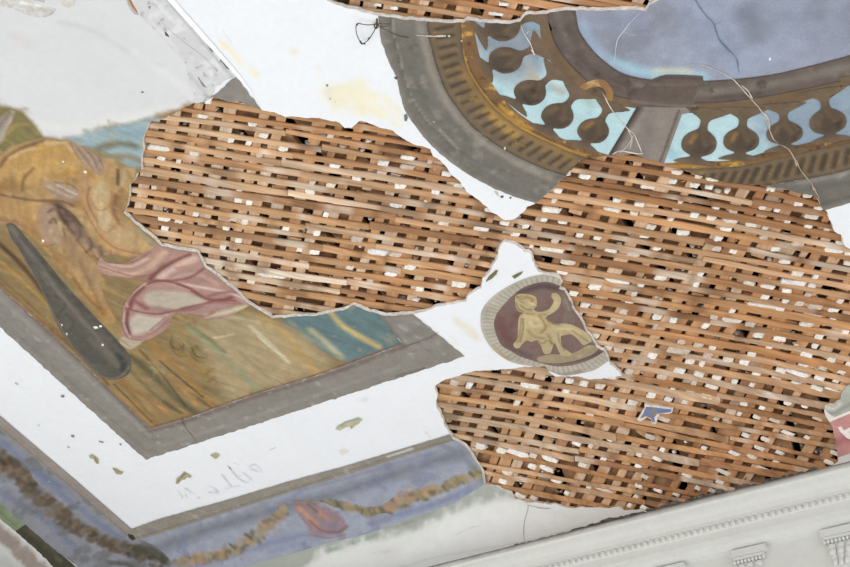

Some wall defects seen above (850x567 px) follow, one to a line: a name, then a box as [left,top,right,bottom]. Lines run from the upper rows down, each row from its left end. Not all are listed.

spalling [327,0,658,24]
crack [688,0,819,198]
spalling [124,97,850,512]